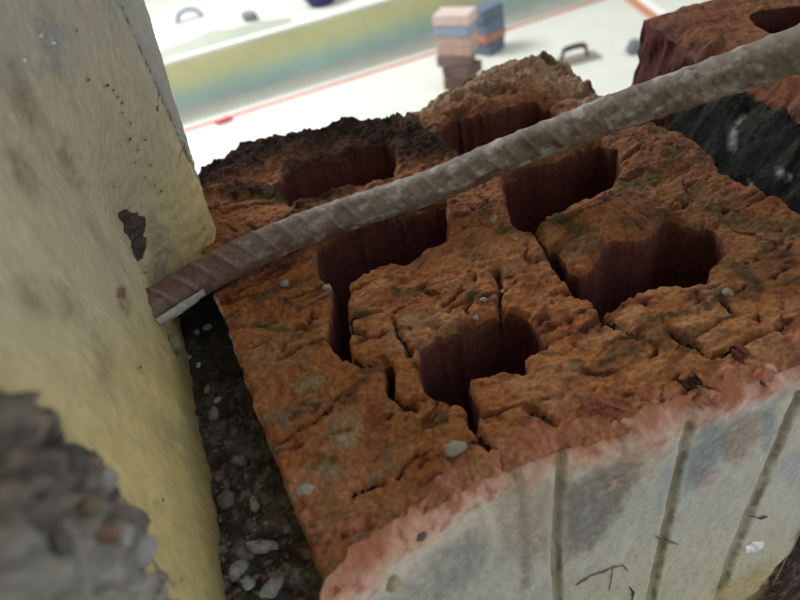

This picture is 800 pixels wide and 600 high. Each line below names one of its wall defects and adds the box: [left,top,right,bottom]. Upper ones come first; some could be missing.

spalling [117,209,147,262]
crack [534,234,550,263]
crack [496,282,504,340]
crack [394,325,411,358]
crack [600,322,634,339]
crack [668,334,752,358]
crack [394,398,417,413]
crack [527,413,553,427]
crack [469,436,491,453]
crack [352,486,378,498]
water stain [568,466,639,553]
crack [576,565,635,600]